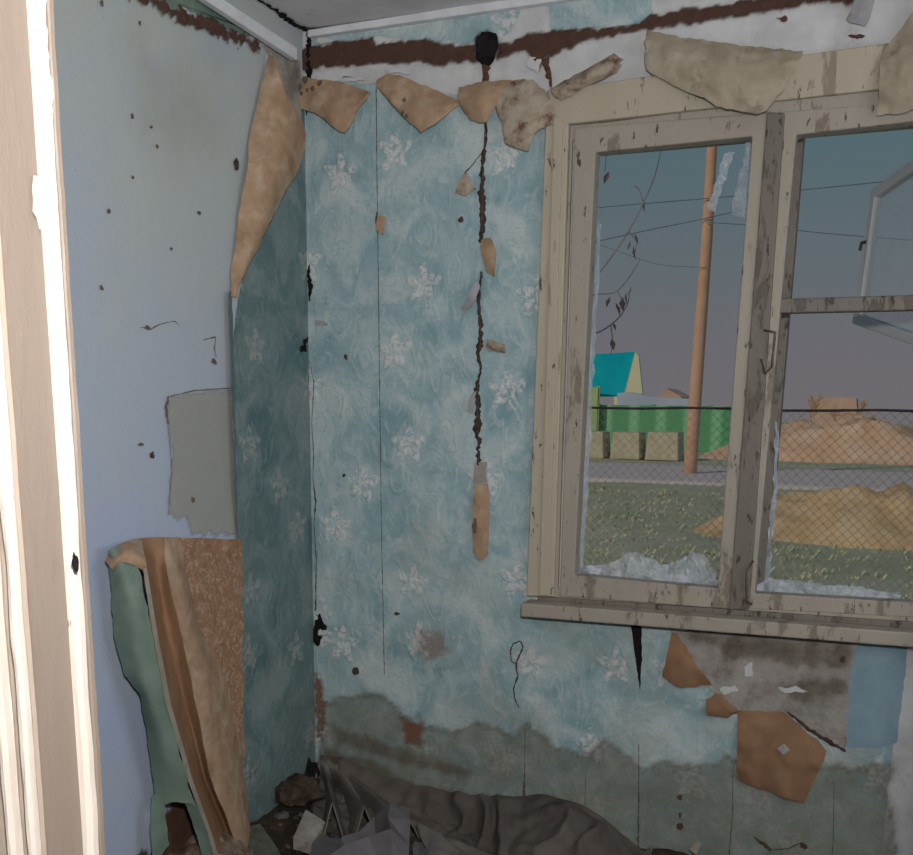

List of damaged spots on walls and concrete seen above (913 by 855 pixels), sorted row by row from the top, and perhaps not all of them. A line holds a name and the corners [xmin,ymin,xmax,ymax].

flaking render [139,0,477,121]
flaking render [497,0,854,87]
crack [465,122,488,243]
crack [306,265,314,301]
crack [472,272,484,465]
peeling [165,387,237,536]
crack [300,337,317,611]
flaking render [670,628,856,749]
leakage [331,719,463,792]